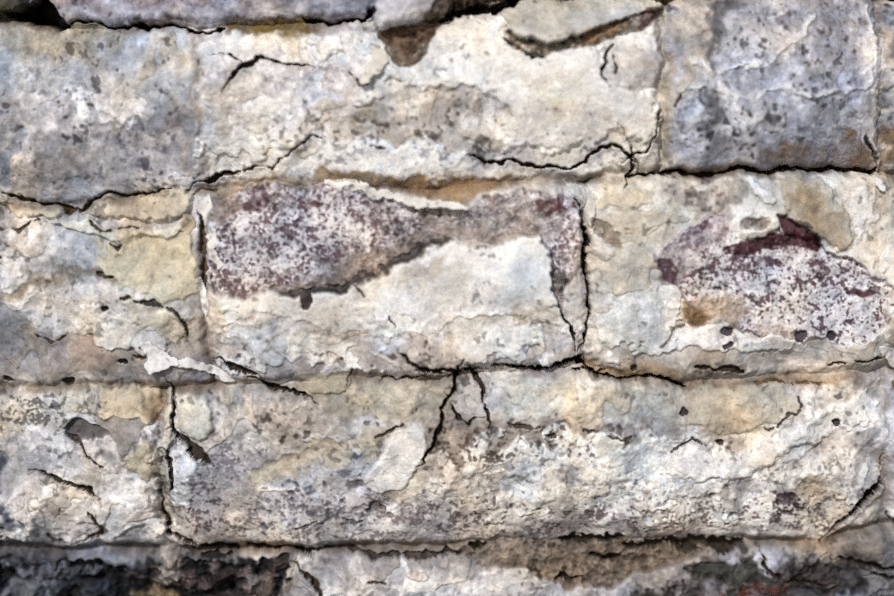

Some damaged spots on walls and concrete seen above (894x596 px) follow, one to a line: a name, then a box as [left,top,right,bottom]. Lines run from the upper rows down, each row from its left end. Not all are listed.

crack [213,54,306,87]
spalling [359,0,508,84]
spalling [502,6,661,58]
crack [471,94,682,188]
spalling [98,178,616,382]
crack [551,199,591,351]
spalling [653,172,894,367]
crack [161,383,211,546]
crack [382,315,557,464]
crack [582,429,632,442]
crack [823,458,881,537]
crack [761,554,894,587]